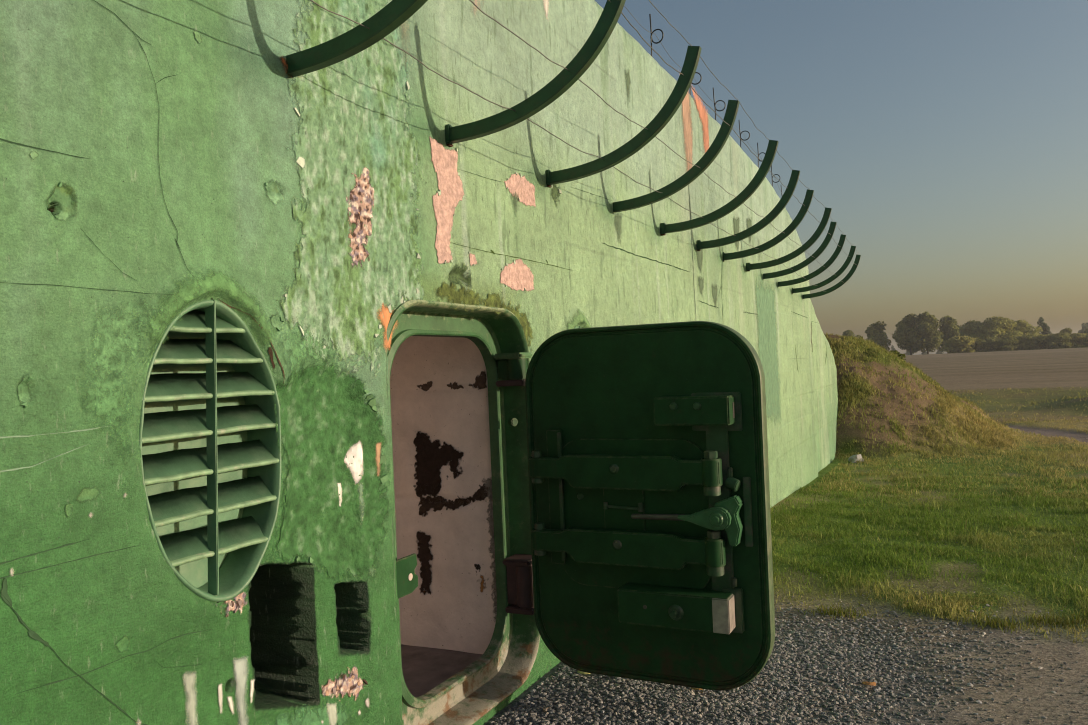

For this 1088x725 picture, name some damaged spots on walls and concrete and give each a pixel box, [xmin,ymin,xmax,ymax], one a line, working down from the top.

crack [94,0,175,104]
spalling [293,0,388,51]
corrosion [682,89,709,171]
crack [158,131,189,271]
peeling [504,172,536,207]
crack [0,229,175,295]
crack [219,299,285,378]
spalling [264,28,477,582]
peeling [500,259,534,291]
peeling [416,531,433,595]
crack [0,539,211,725]
spalling [322,667,368,700]